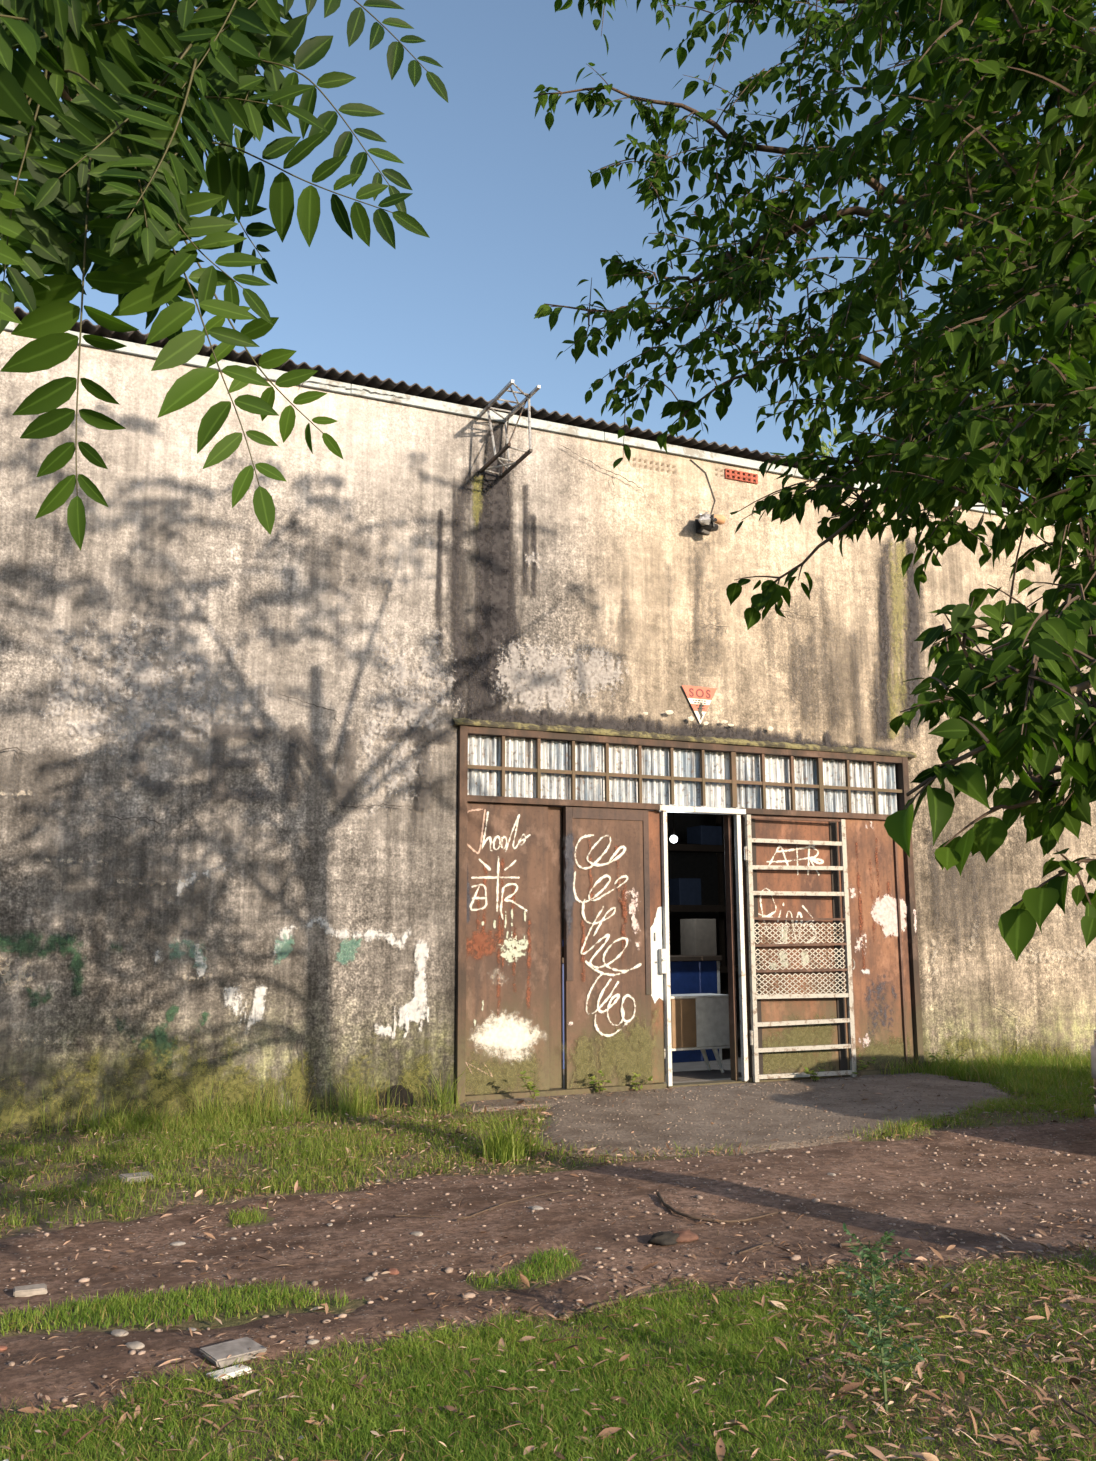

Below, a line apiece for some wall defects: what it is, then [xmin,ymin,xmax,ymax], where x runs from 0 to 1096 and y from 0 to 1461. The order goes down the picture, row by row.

leakage [356,426,925,813]
corrosion [466,858,531,1018]
corrosion [615,846,628,958]
corrosion [855,838,891,971]